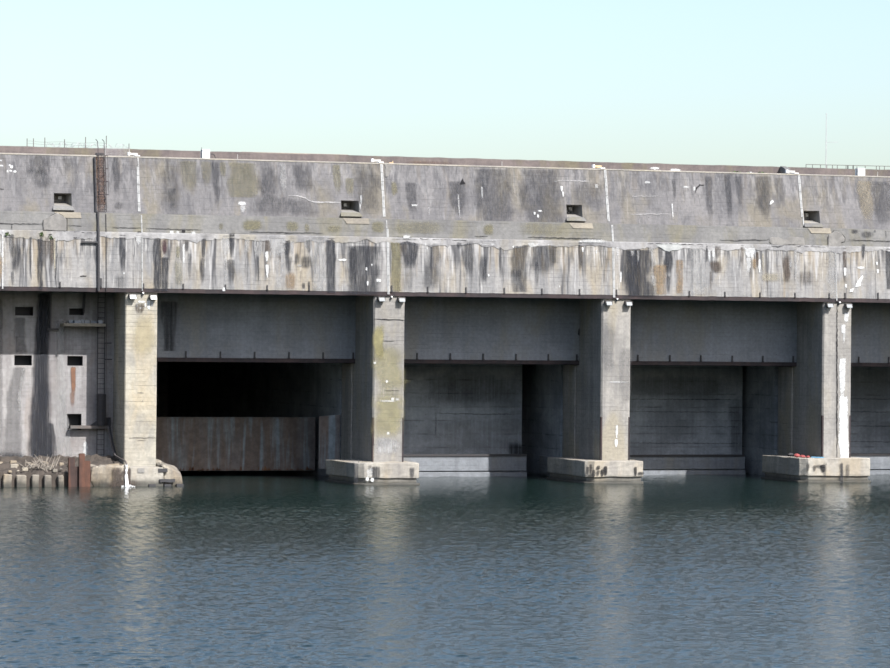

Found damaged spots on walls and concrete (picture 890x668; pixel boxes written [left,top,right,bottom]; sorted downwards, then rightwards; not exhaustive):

water stain [2,230,19,289]
water stain [138,239,169,309]
water stain [223,234,234,279]
water stain [246,222,309,287]
water stain [326,239,381,294]
water stain [401,239,418,266]
water stain [513,246,555,291]
water stain [620,247,672,296]
water stain [706,245,721,272]
water stain [745,246,797,280]
water stain [836,230,870,296]
water stain [29,237,56,457]